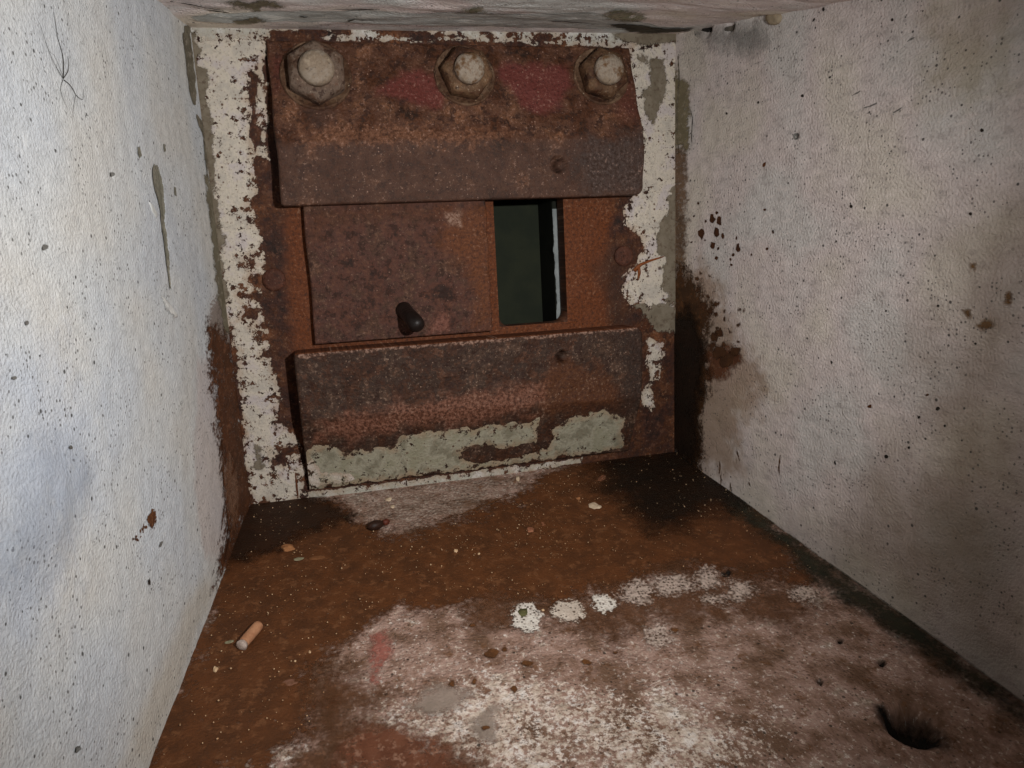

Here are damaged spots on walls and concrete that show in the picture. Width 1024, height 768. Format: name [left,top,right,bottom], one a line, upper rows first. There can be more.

peeling [170,0,676,508]
rust [690,202,752,266]
rust [674,262,745,470]
rust [133,509,157,541]
rust [149,316,833,768]
water stain [508,564,760,633]
water stain [596,452,1024,719]